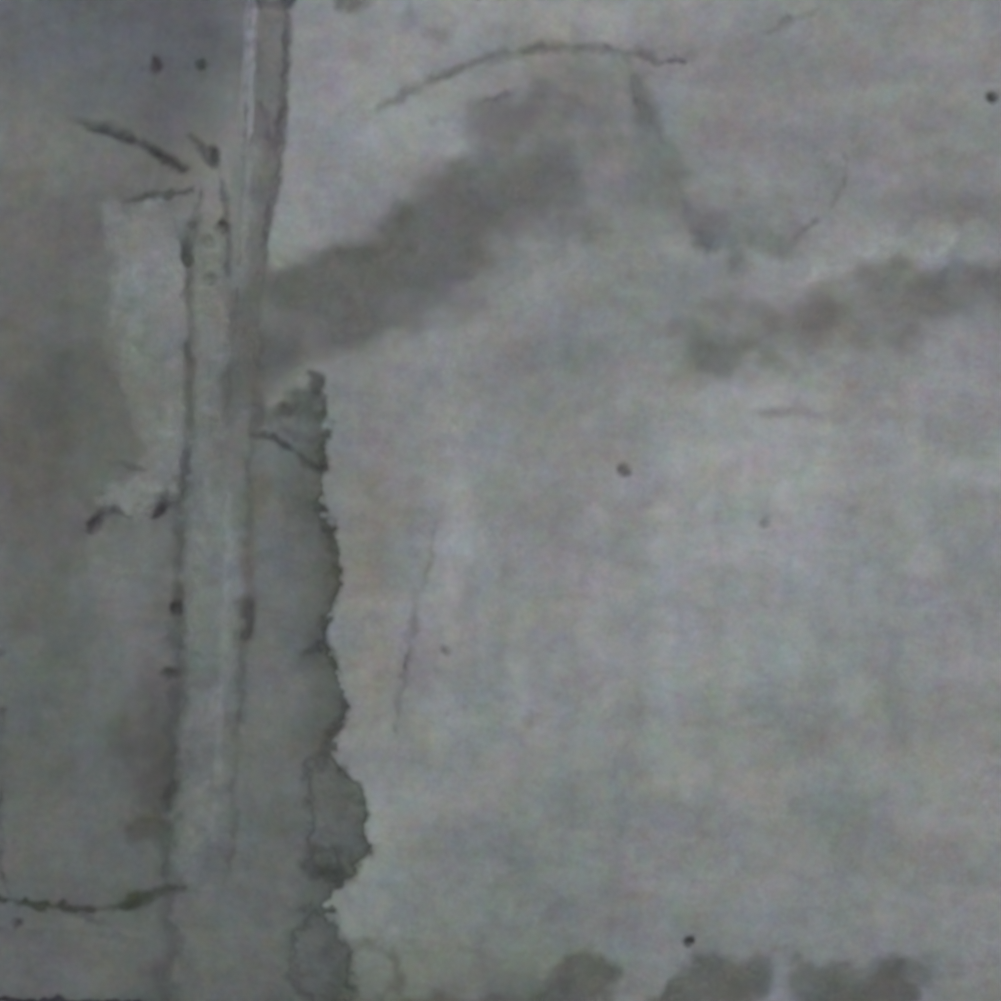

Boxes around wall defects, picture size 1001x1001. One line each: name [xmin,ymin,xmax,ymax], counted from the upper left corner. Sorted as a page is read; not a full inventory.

damp [229,154,578,392]
damp [537,953,621,1001]
damp [661,955,771,1001]
damp [804,961,917,1001]